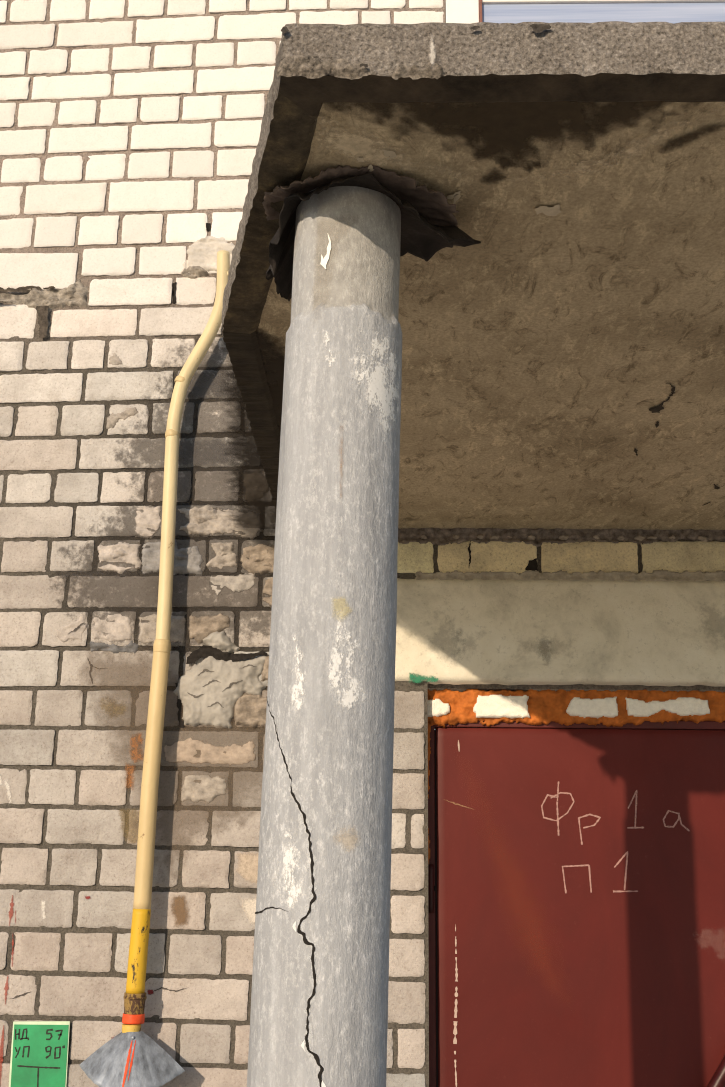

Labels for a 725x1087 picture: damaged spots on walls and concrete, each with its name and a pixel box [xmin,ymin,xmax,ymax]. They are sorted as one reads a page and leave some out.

water stain [318,101,725,184]
peeling [354,333,399,434]
crack [649,383,675,428]
spalling [97,505,162,574]
spalling [173,504,275,608]
spalling [55,614,157,644]
spalling [170,613,268,664]
peeling [292,637,306,710]
peeling [329,609,365,708]
spalling [164,683,256,803]
crack [255,693,326,1087]